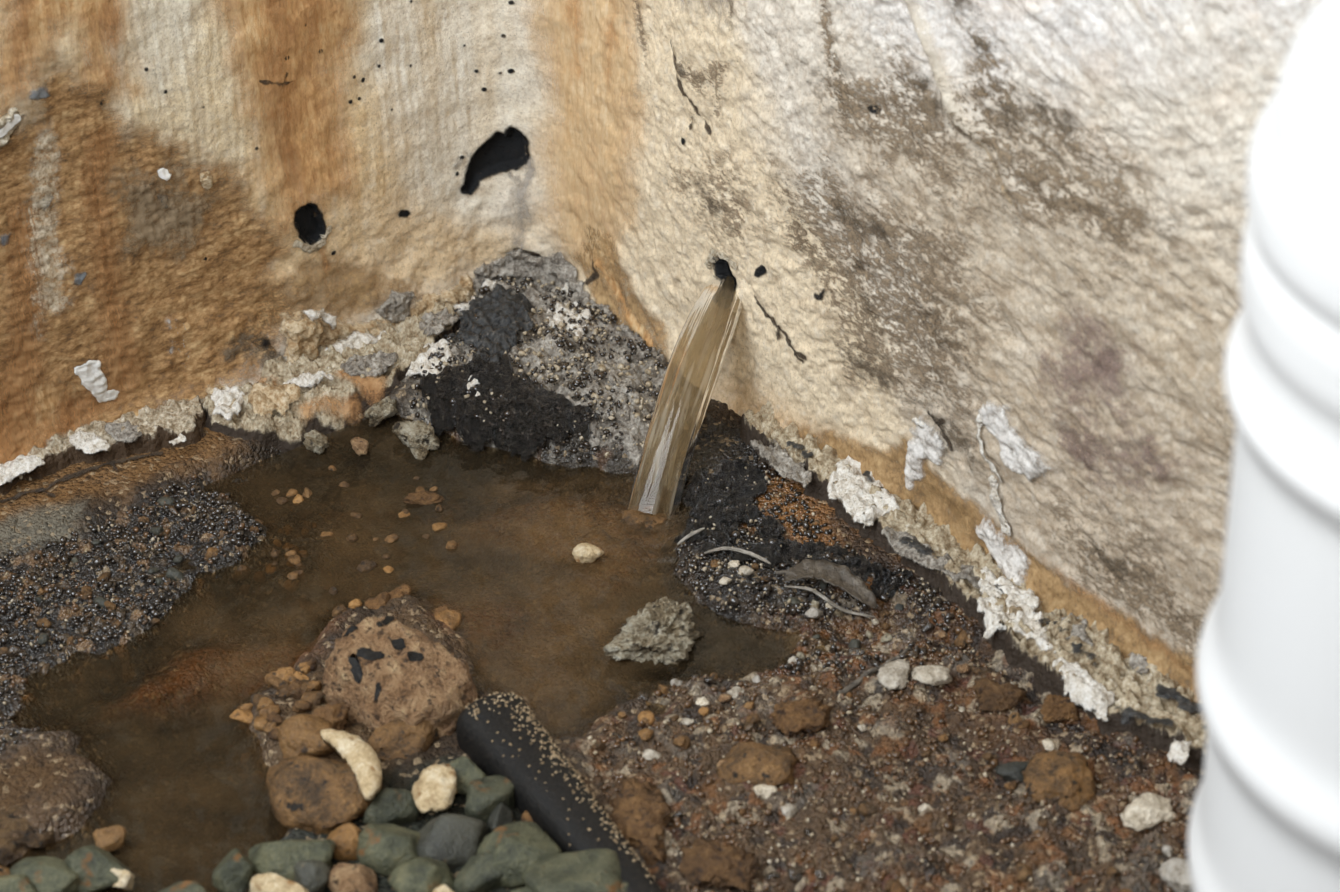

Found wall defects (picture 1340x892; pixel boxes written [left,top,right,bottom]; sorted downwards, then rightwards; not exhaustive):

rust [0,0,119,94]
spalling [0,71,332,464]
rust [223,0,357,224]
water stain [0,243,706,495]
water stain [676,61,726,116]
water stain [677,155,749,238]
crack [754,295,806,363]
water stain [740,166,1207,769]
water stain [818,0,1176,263]